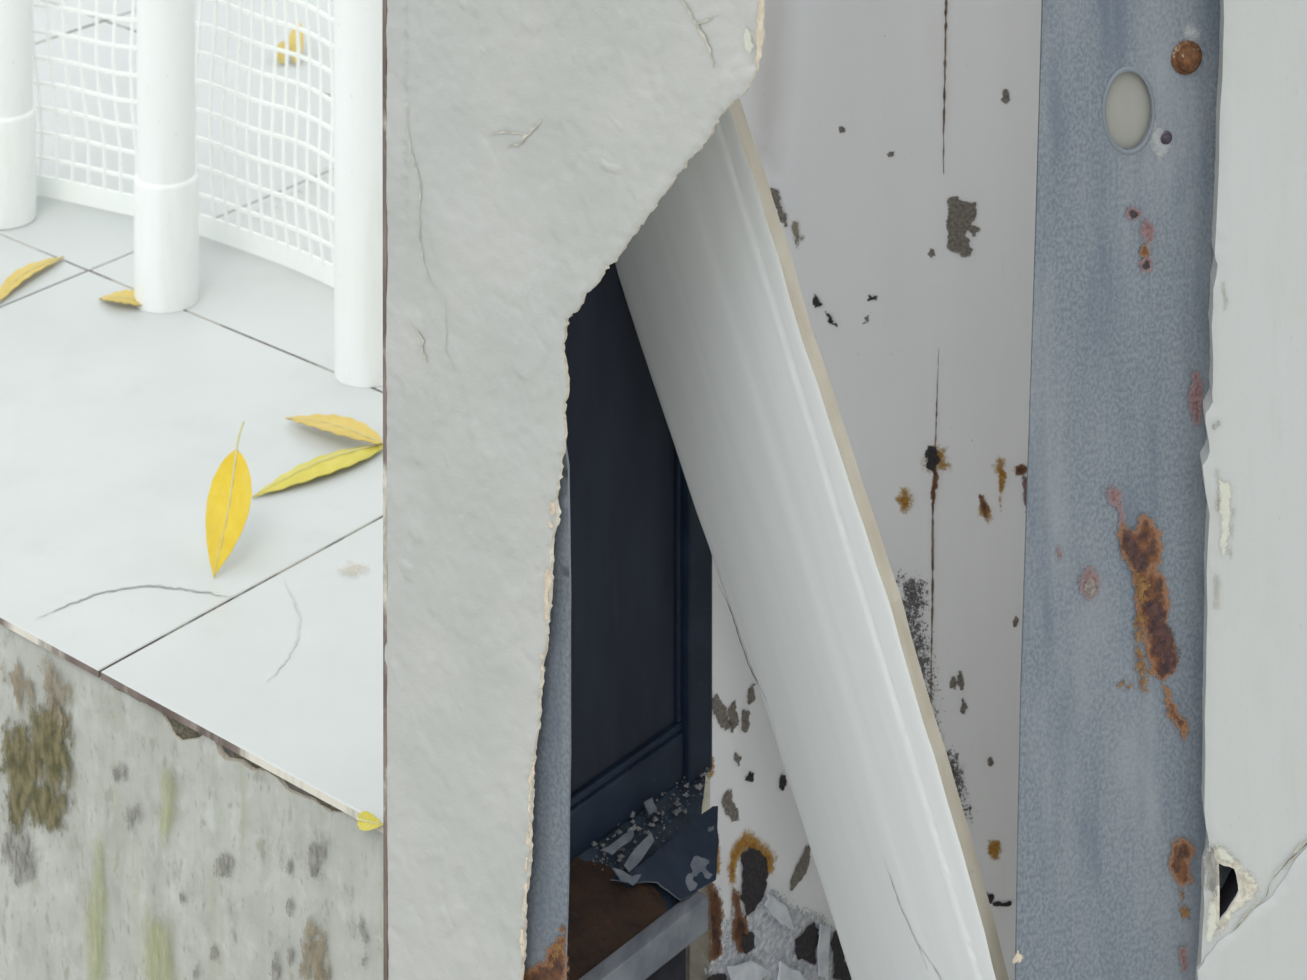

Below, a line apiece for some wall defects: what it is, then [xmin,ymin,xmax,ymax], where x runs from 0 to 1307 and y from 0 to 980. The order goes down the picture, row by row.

peeling [927,196,981,257]
rust [896,489,912,514]
rust [924,446,950,504]
rust [978,457,1027,522]
rust [1106,486,1189,740]
water stain [896,569,974,823]
water stain [0,659,74,888]
rust [523,924,569,980]
peeling [705,846,851,980]
rust [1169,837,1195,919]
flaking render [1203,846,1259,942]
crack [1232,841,1307,931]